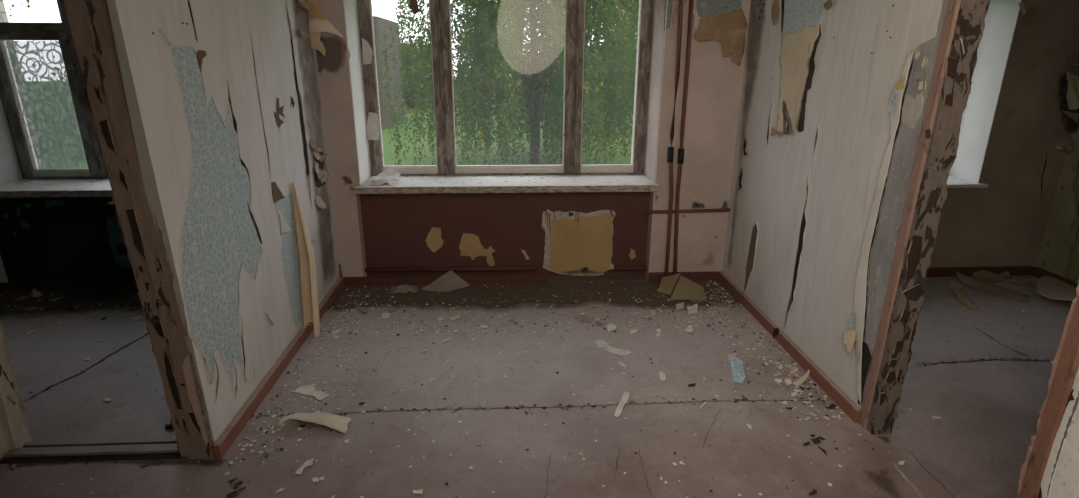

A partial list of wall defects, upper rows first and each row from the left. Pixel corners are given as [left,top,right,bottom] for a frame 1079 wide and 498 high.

flaking render [862,0,958,407]
peeling [425,227,444,252]
peeling [459,233,496,266]
peeling [541,207,616,276]
crack [22,331,149,403]
crack [914,326,1050,366]
crack [252,396,828,449]